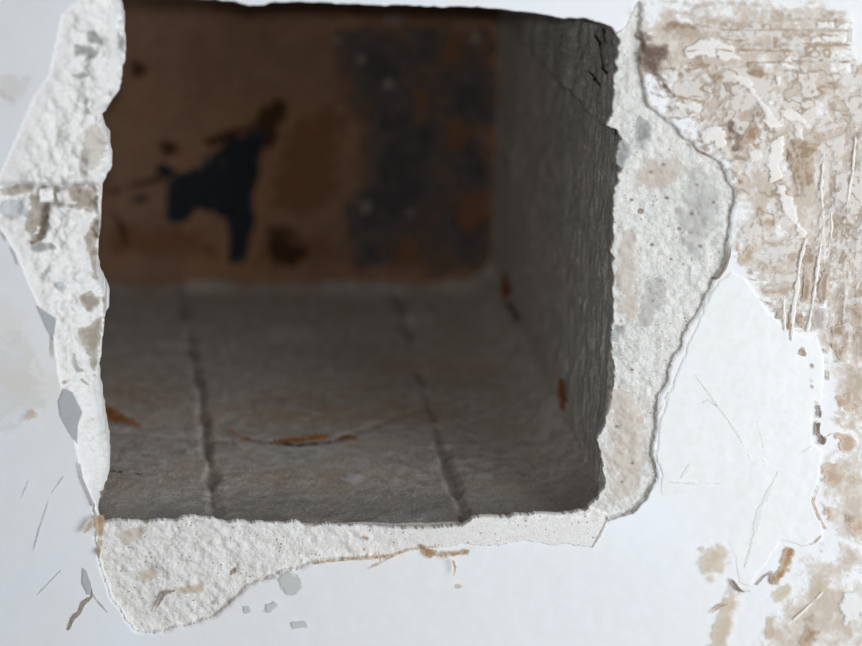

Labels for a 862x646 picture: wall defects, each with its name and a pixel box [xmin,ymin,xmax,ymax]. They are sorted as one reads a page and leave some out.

peeling [684,7,849,64]
peeling [718,65,847,135]
peeling [831,70,862,129]
flaking render [0,0,126,516]
flaking render [498,1,824,586]
water stain [635,0,862,646]
peeling [806,136,862,332]
spalling [82,568,93,595]
flaking render [95,506,609,634]
corrosion [420,544,470,589]